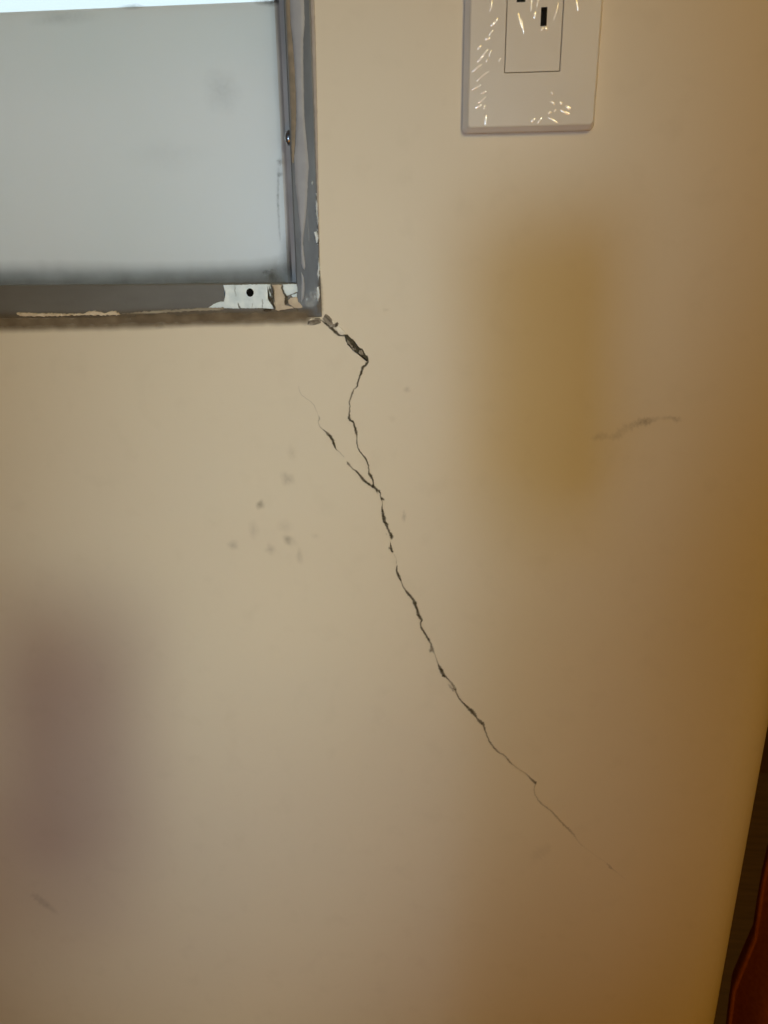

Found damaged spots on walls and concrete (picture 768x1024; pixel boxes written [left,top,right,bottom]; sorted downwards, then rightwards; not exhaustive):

crack [307,314,495,749]